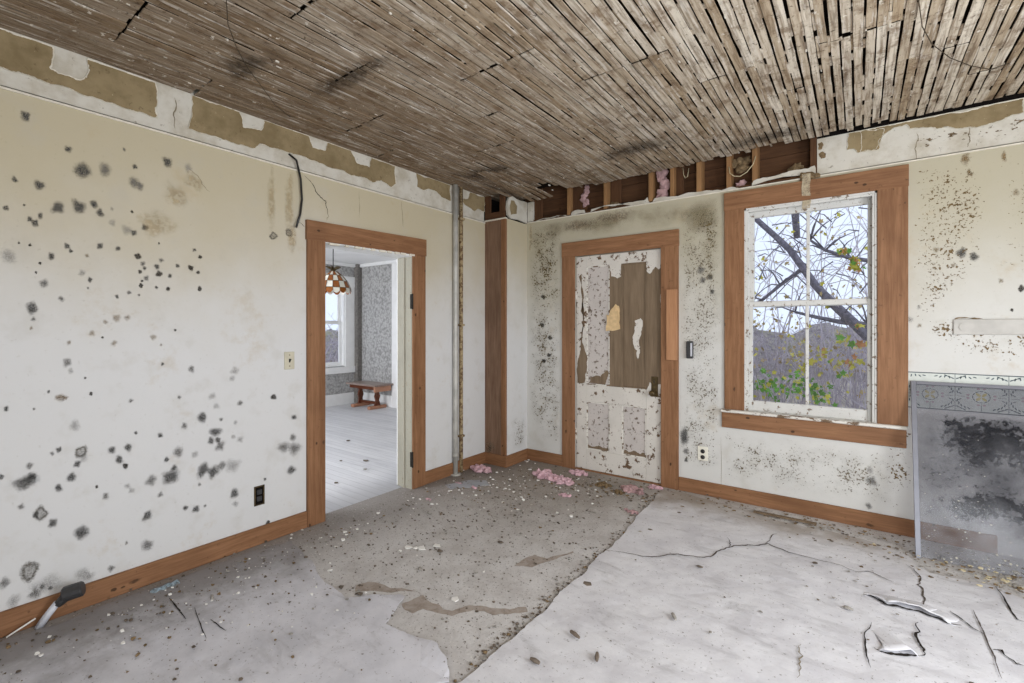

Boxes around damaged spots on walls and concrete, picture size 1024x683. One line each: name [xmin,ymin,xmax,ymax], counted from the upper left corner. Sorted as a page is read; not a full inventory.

peeling [0,28,158,118]
peeling [188,95,396,188]
peeling [847,98,1024,153]
water stain [23,201,104,225]
peeling [416,173,485,212]
water stain [116,249,202,298]
water stain [914,169,1024,355]
water stain [681,207,720,465]
water stain [198,413,224,449]
water stain [0,463,36,490]
water stain [146,449,182,497]
crack [611,533,1022,678]